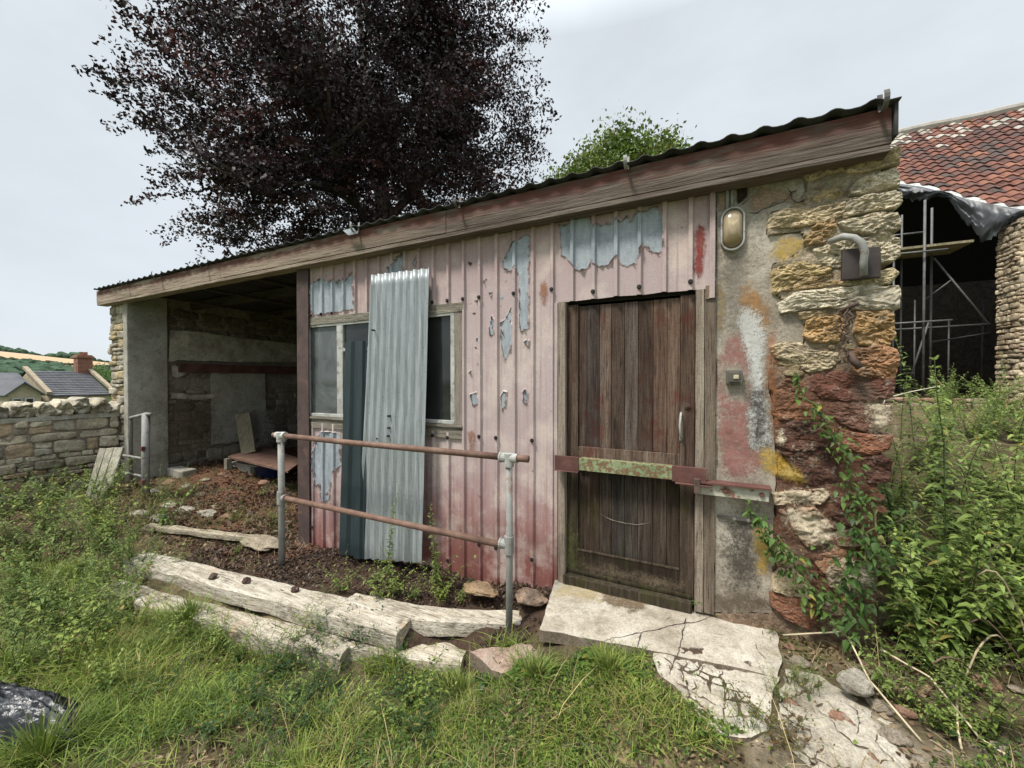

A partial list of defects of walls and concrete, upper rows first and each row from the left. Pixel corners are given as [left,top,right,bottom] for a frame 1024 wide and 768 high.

peeling [557,205,665,272]
peeling [309,271,355,316]
peeling [472,234,531,360]
peeling [310,430,342,503]
crack [607,616,750,738]